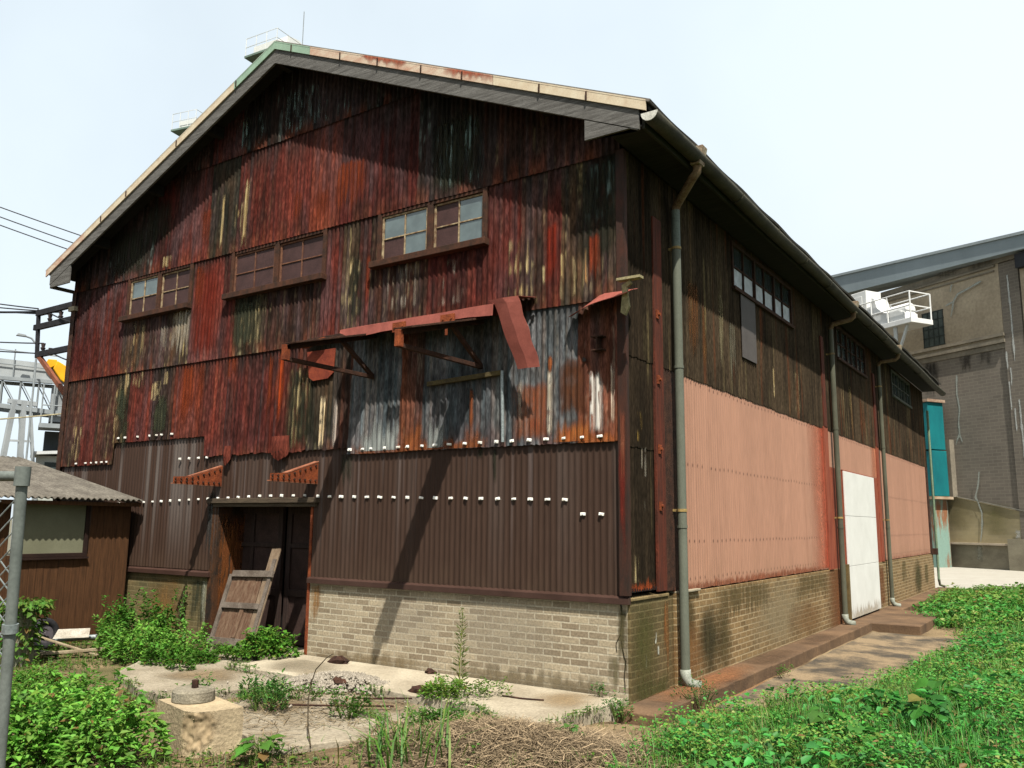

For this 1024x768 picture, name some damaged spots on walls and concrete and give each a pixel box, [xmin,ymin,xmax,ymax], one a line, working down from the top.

corrosion [364,55,403,64]
corrosion [449,68,488,76]
corrosion [267,358,284,412]
corrosion [359,390,480,454]
corrosion [518,360,625,523]
corrosion [701,426,844,627]
water stain [689,584,791,669]